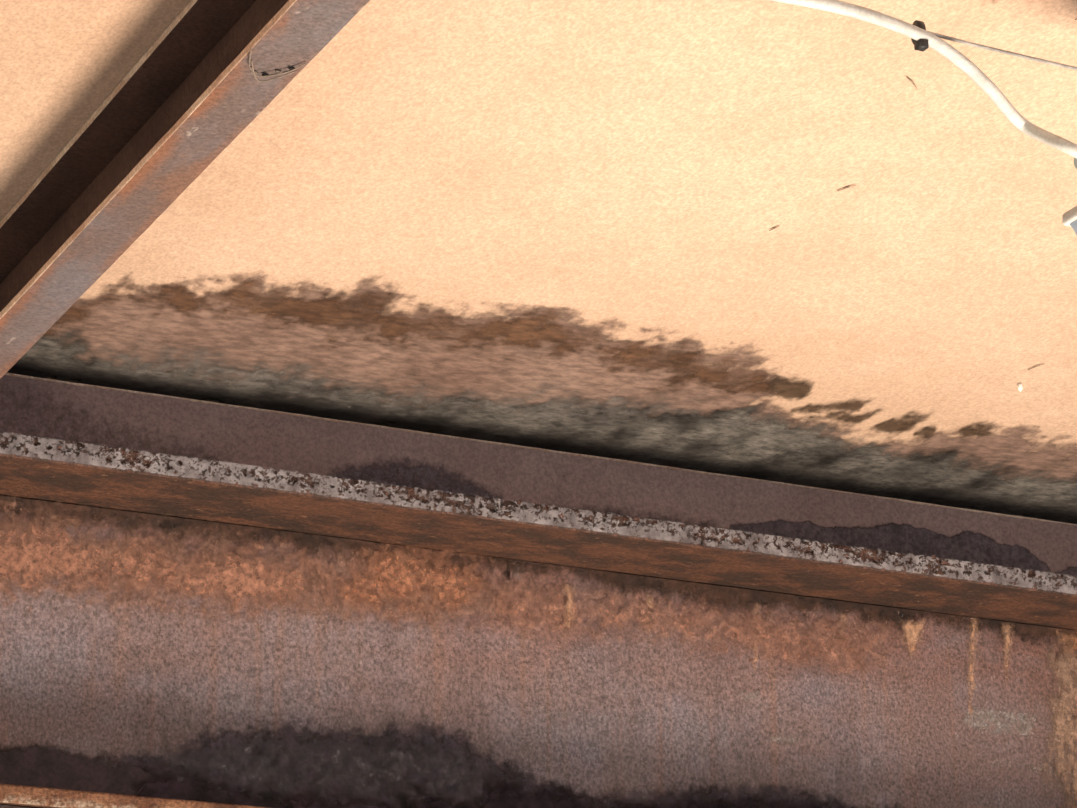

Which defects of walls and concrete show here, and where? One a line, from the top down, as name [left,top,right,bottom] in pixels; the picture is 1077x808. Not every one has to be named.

damp [1,276,1077,524]
damp [0,716,855,808]
corrosion [0,495,1077,808]
damp [729,519,1077,577]